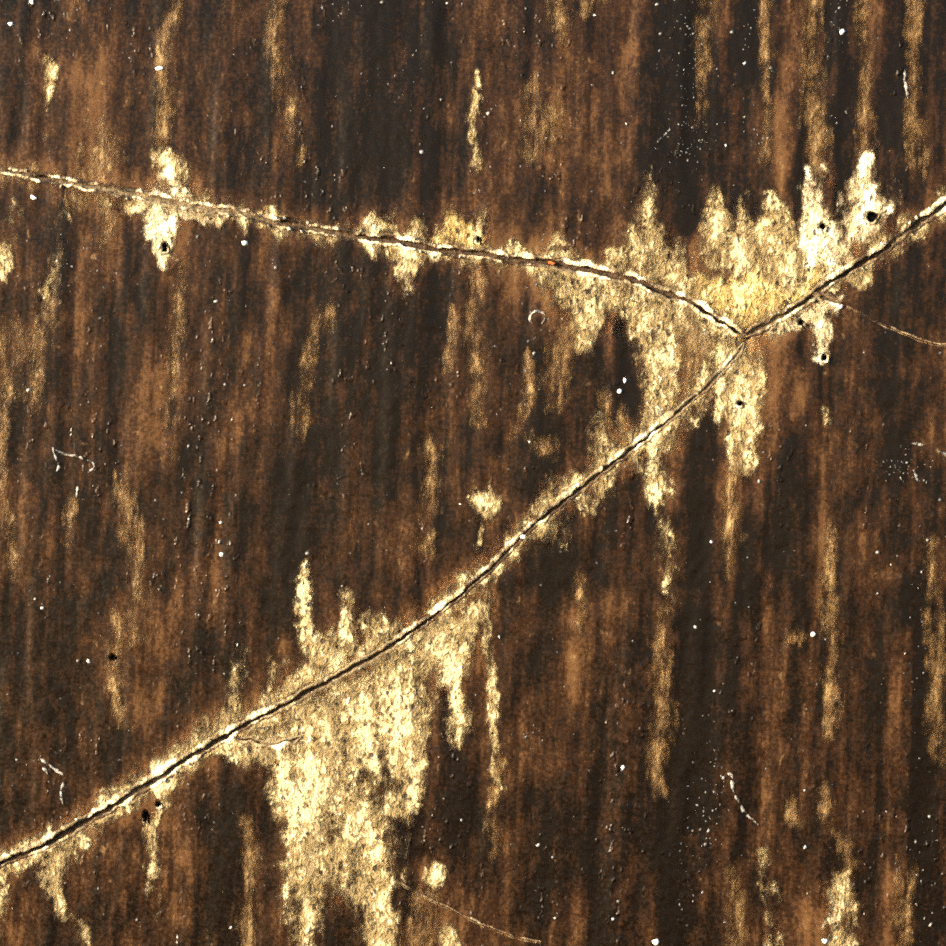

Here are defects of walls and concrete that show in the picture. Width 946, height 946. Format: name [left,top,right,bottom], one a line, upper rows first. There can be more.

water stain [760,0,771,123]
water stain [602,393,625,442]
crack [0,163,946,886]
water stain [479,590,507,809]
water stain [241,820,259,946]
crack [397,880,542,944]